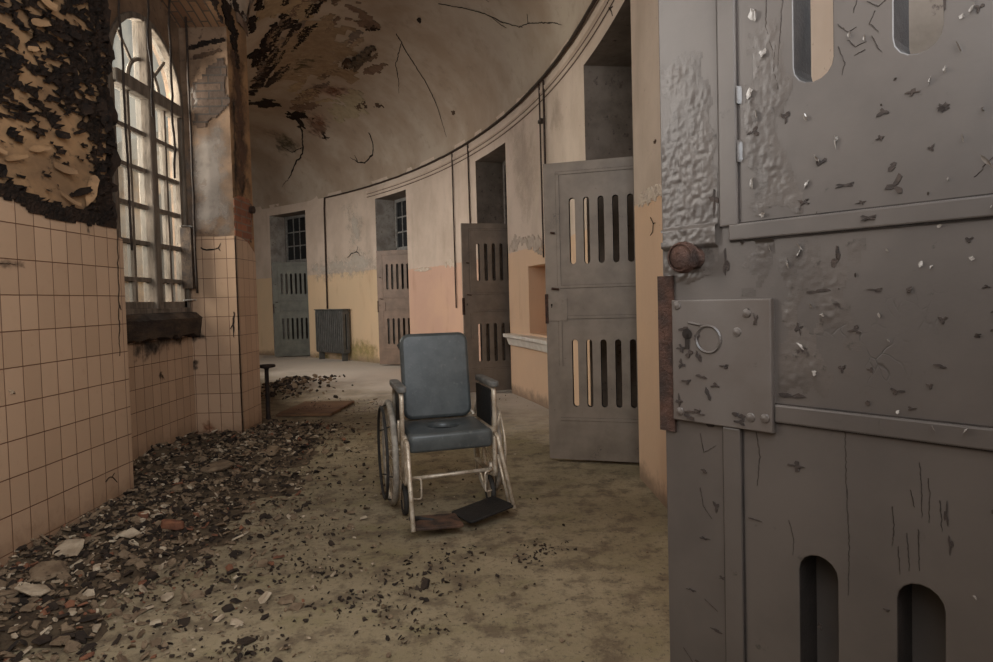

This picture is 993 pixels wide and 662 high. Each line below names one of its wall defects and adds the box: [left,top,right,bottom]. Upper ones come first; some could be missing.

crack [438,0,561,28]
peeling [0,0,121,229]
peeling [188,0,388,139]
crack [281,111,304,187]
crack [395,34,445,132]